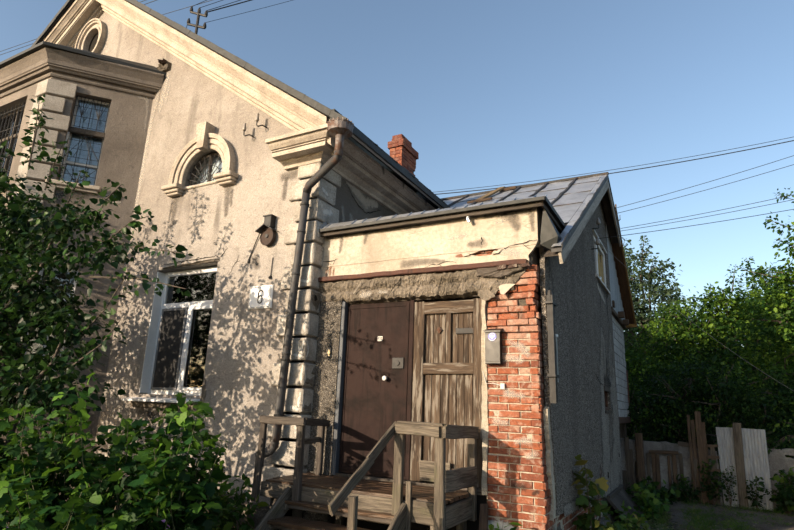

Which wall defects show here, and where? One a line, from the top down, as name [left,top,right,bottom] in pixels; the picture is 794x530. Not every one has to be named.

spalling [476,260,531,298]